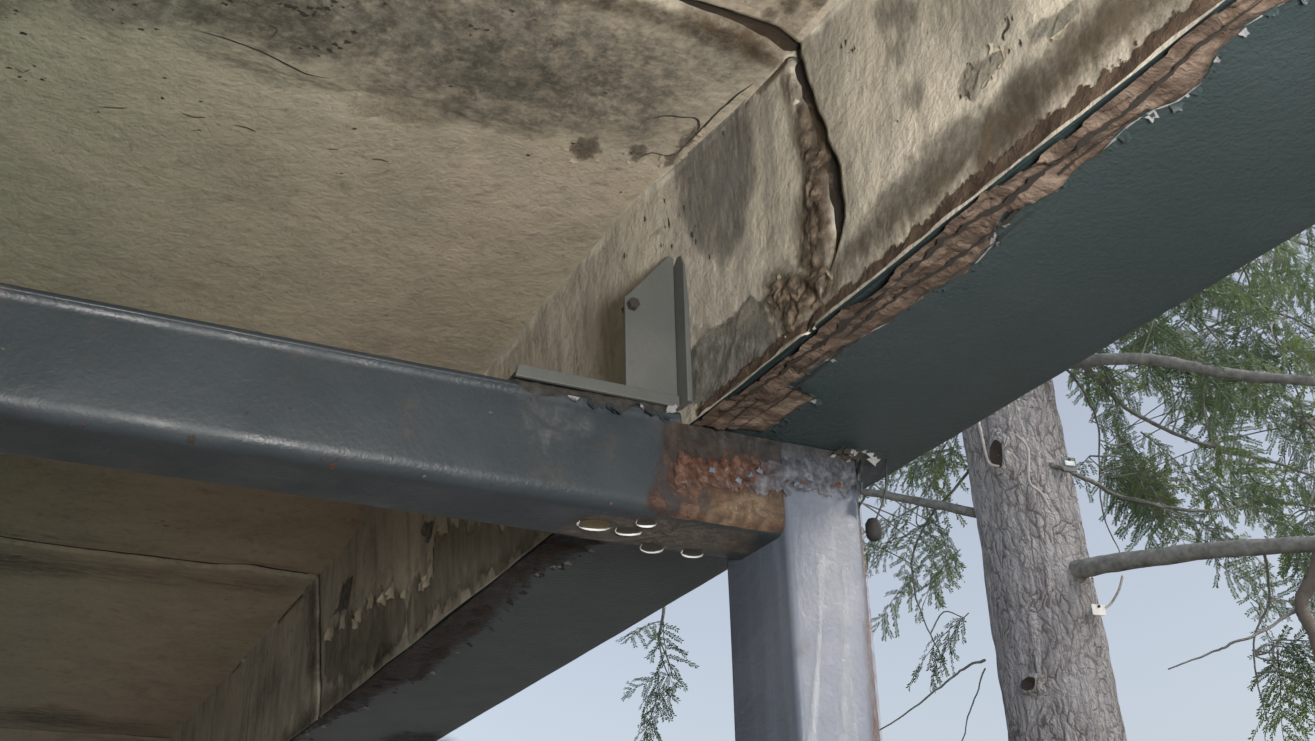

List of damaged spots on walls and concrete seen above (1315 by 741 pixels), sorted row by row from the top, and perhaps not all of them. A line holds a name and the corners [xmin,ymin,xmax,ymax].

water stain [107,0,678,136]
crack [638,83,754,159]
crack [663,0,845,253]
water stain [846,0,1154,254]
peeling [959,0,1079,100]
rust [572,0,1309,558]
rust [867,609,879,741]